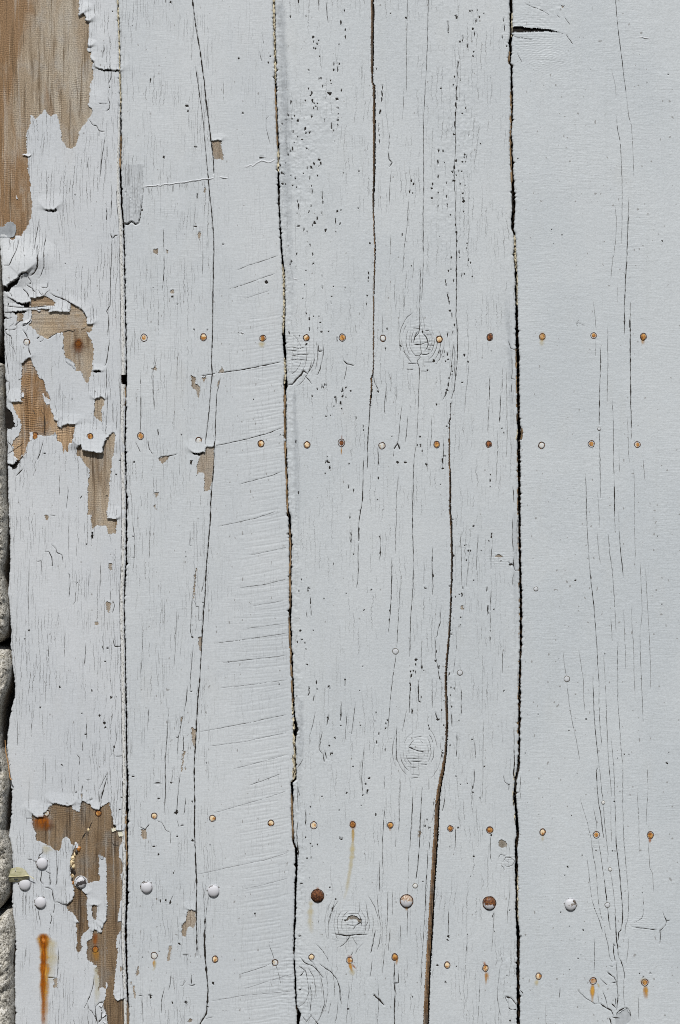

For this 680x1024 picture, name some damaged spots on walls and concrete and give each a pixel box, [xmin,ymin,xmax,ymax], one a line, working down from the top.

peeling [0,0,94,240]
peeling [211,139,224,160]
peeling [279,63,342,271]
peeling [8,296,105,422]
peeling [12,357,135,534]
crack [5,47,176,667]
peeling [190,447,214,491]
peeling [191,367,224,398]
crack [45,0,523,1024]
corrosion [38,934,52,1013]
peeling [31,791,152,1024]
peeling [159,909,196,961]